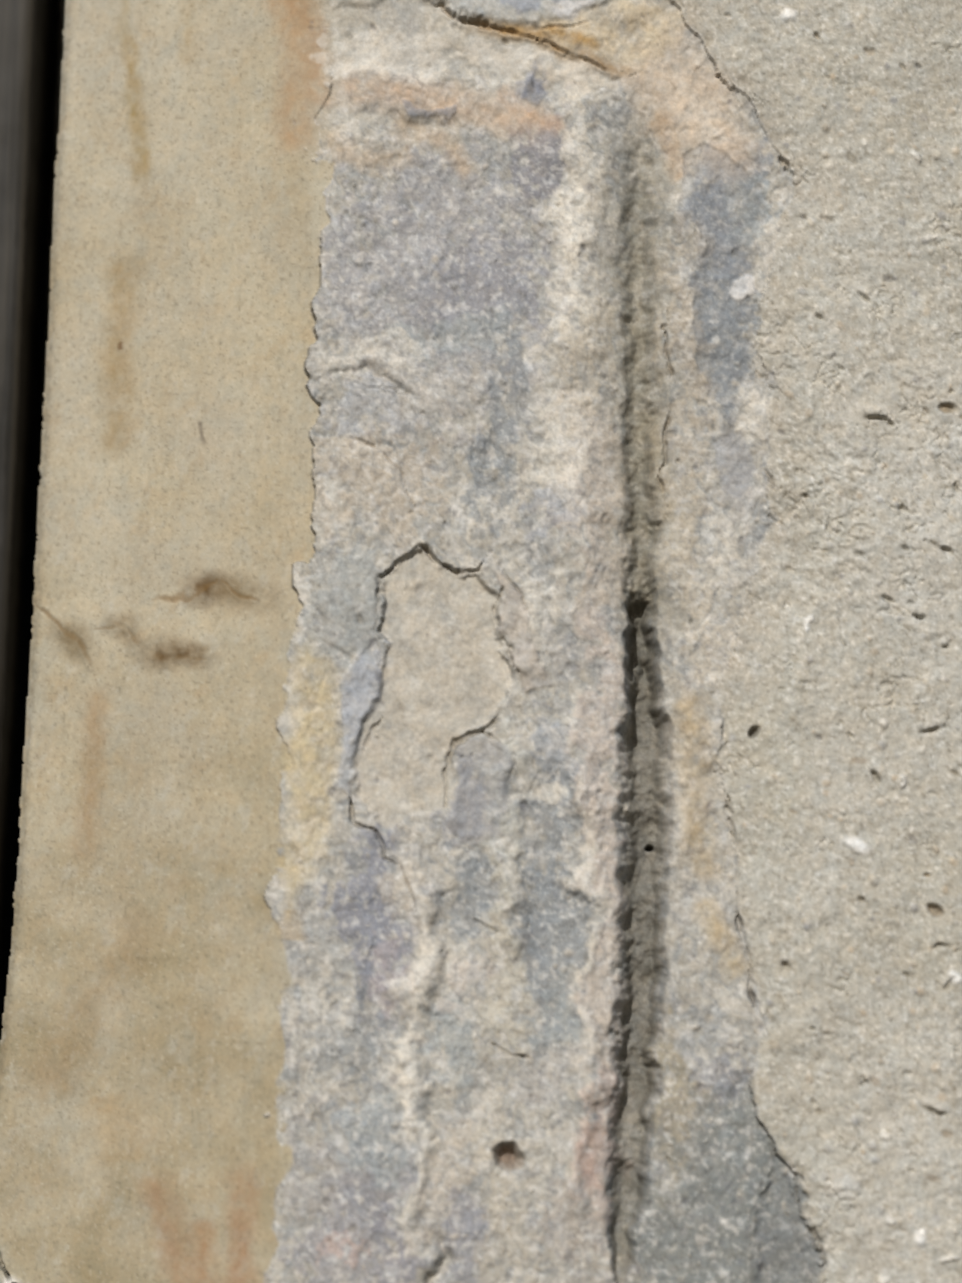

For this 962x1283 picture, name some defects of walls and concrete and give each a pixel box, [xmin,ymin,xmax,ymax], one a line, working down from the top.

corrosion [258,0,568,184]
spalling [398,97,459,123]
spalling [315,0,634,109]
crack [421,0,639,78]
crack [777,154,792,173]
peeling [676,140,776,503]
crack [654,302,677,532]
spalling [305,542,556,853]
spalling [746,725,764,740]
spalling [643,845,657,854]
spalling [489,1140,529,1175]
spalling [751,1139,831,1283]